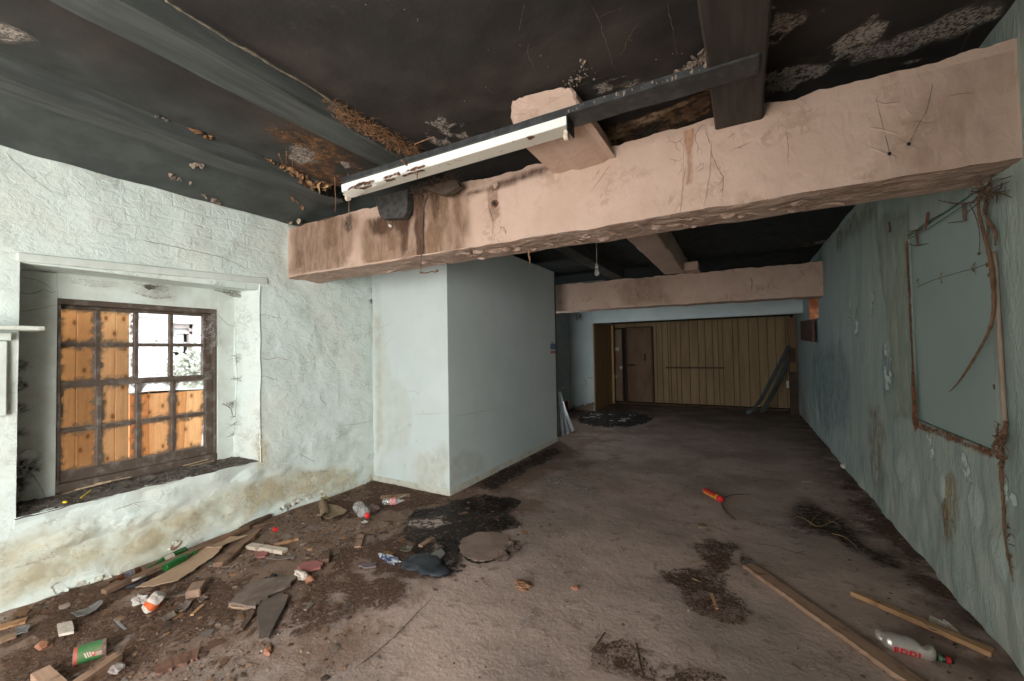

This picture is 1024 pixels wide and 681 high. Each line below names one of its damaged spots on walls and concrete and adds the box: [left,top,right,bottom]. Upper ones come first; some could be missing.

peeling [168,162,204,186]
peeling [262,156,341,194]
damp [364,192,467,263]